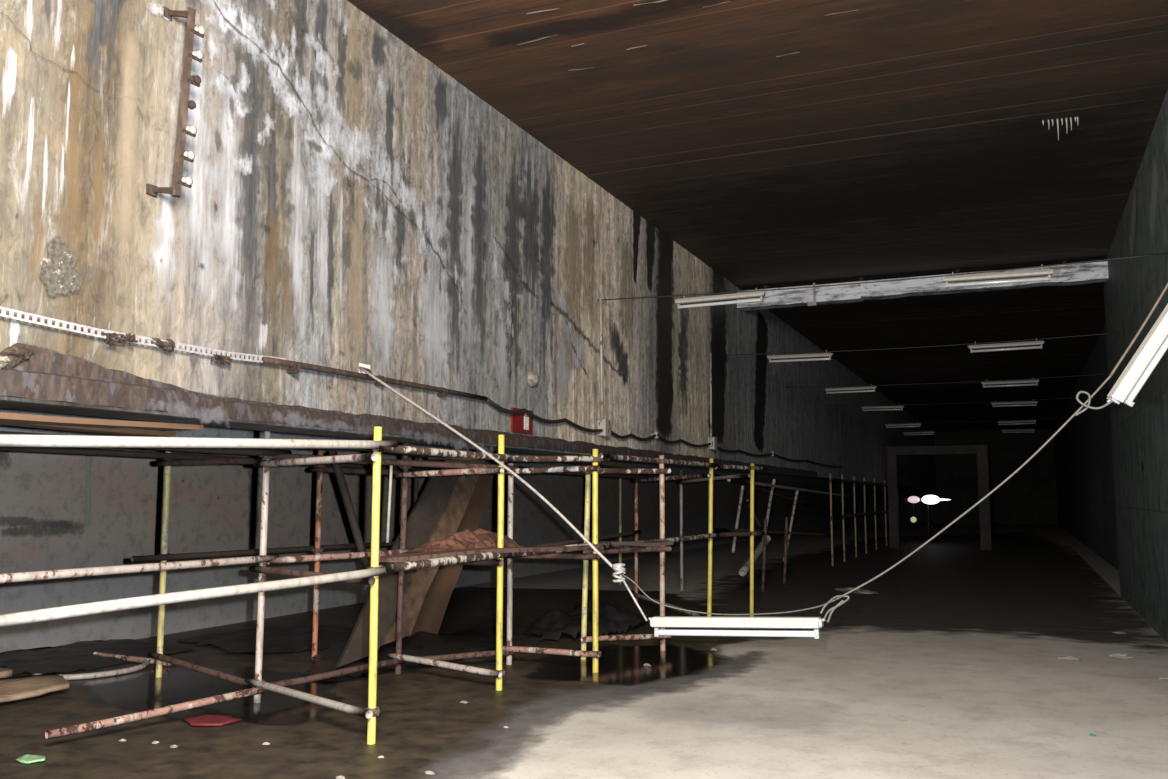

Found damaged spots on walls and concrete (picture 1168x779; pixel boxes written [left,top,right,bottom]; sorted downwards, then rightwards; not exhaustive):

water stain [3,49,17,113]
water stain [26,0,62,53]
water stain [24,83,70,212]
water stain [119,40,138,236]
crack [215,3,466,312]
water stain [153,0,595,400]
water stain [10,322,20,346]
spalling [40,236,81,297]
crack [495,237,625,390]
water stain [609,210,689,438]
water stain [151,400,226,423]
water stain [272,412,374,434]